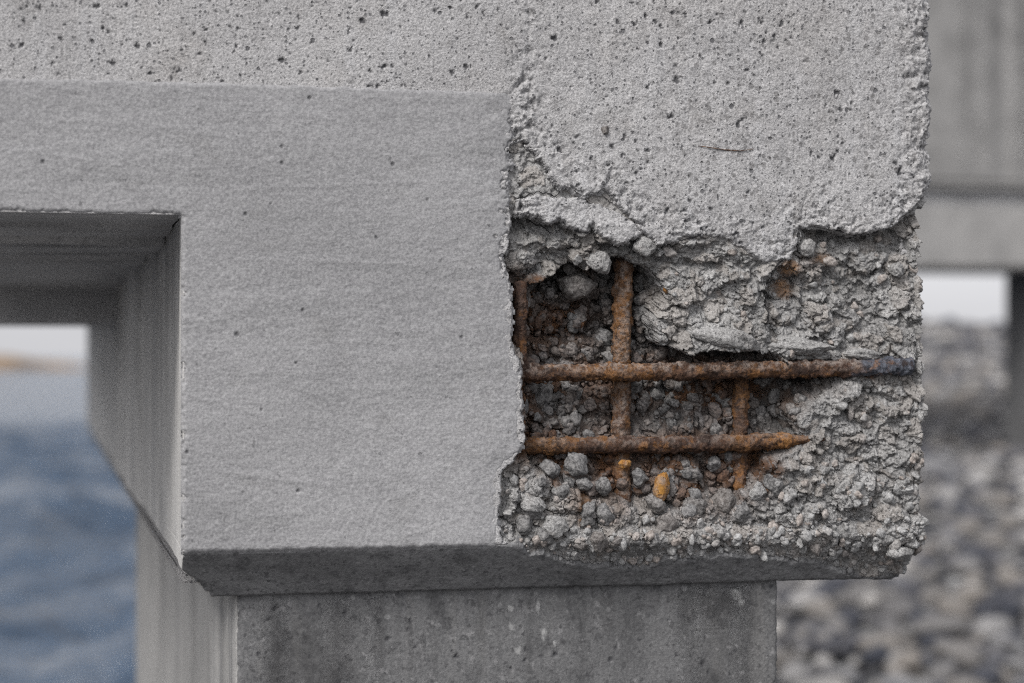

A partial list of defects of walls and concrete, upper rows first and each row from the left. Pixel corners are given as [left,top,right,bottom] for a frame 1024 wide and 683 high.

spalling [498,137,930,578]
corrosion [521,379,562,404]
corrosion [650,452,695,473]
corrosion [747,450,783,492]